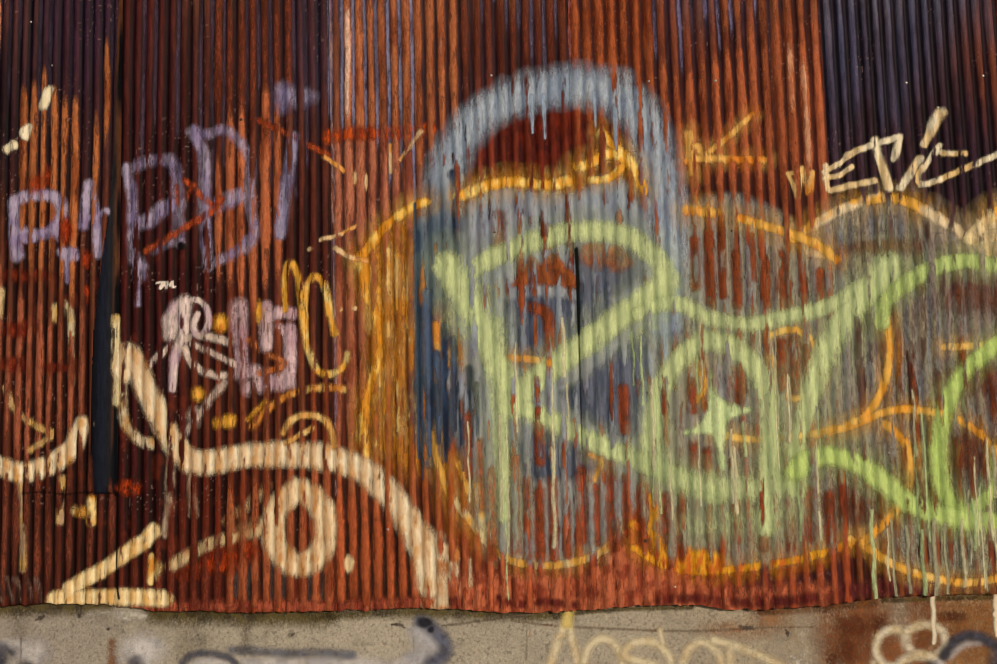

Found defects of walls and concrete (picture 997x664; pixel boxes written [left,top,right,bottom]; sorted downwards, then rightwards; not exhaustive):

corrosion [91,41,110,226]
corrosion [143,0,295,320]
corrosion [308,0,813,450]
corrosion [0,71,92,596]
corrosion [896,347,921,464]
corrosion [959,319,997,446]
corrosion [107,481,141,559]
corrosion [130,467,997,664]